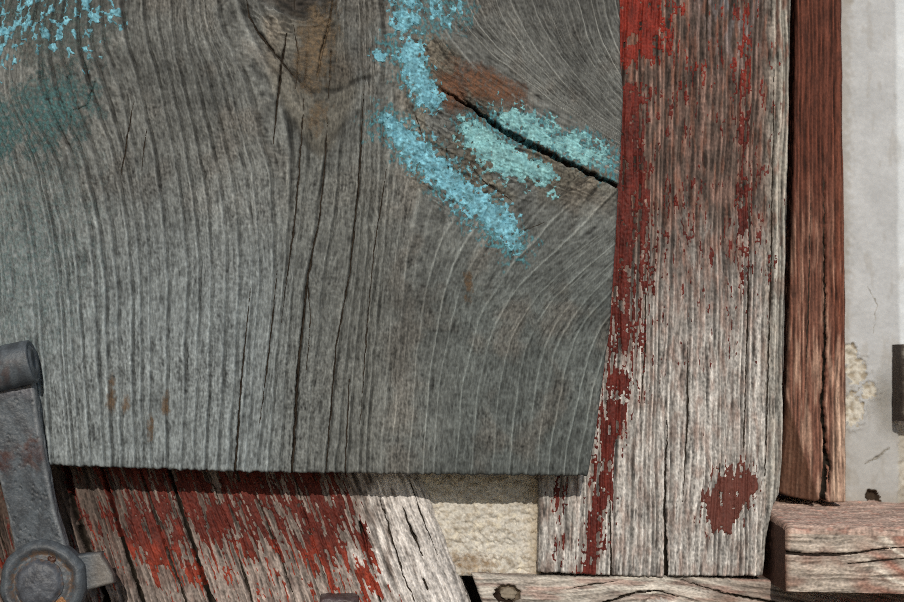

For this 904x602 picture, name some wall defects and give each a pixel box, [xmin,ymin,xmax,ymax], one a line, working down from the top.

peeling [0,0,128,74]
crack [438,86,617,188]
peeling [367,0,782,575]
crack [639,271,647,415]
peeling [61,465,402,602]
crack [574,343,775,602]
crack [785,547,904,564]
crack [865,447,890,464]